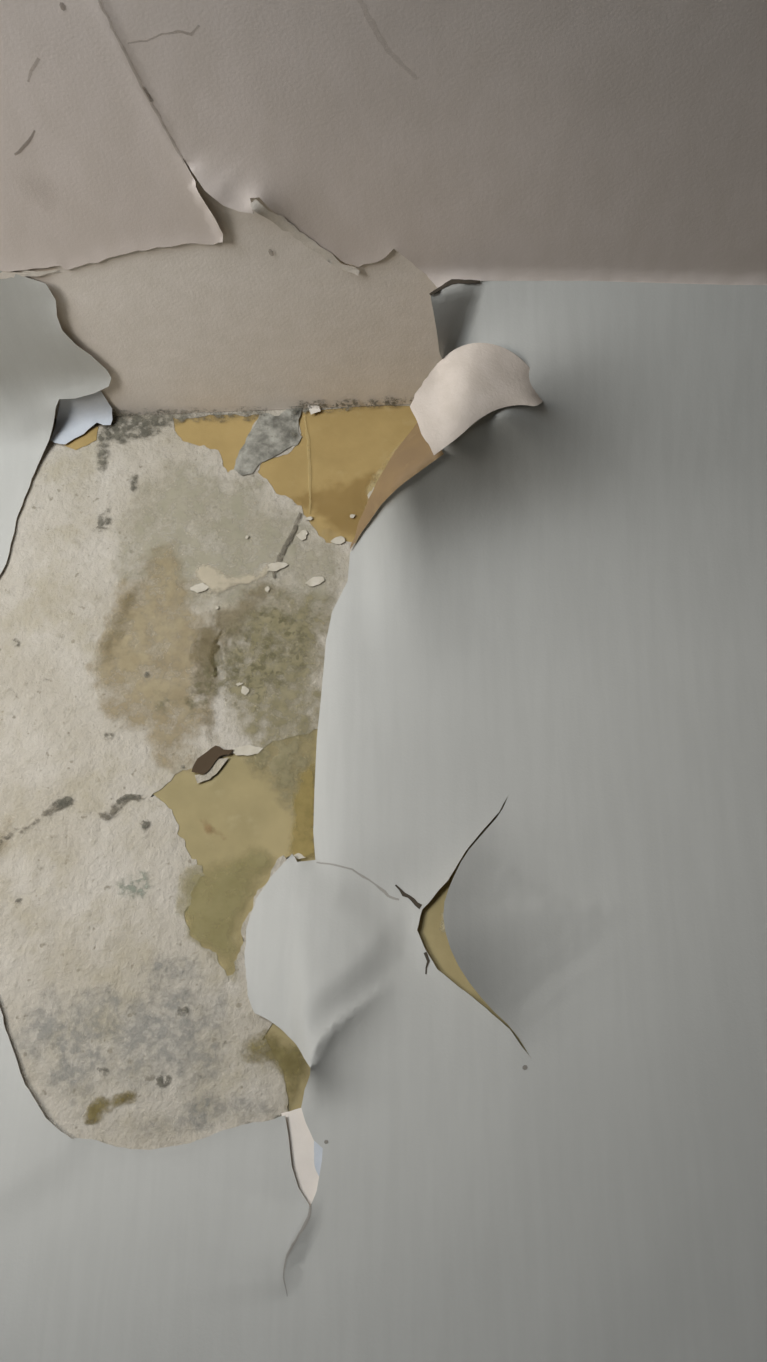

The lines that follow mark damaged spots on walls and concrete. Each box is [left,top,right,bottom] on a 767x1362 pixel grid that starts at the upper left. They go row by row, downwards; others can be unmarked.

mould [97,408,265,469]
mould [299,399,411,413]
damp [98,470,333,805]
flaking render [0,160,767,1150]